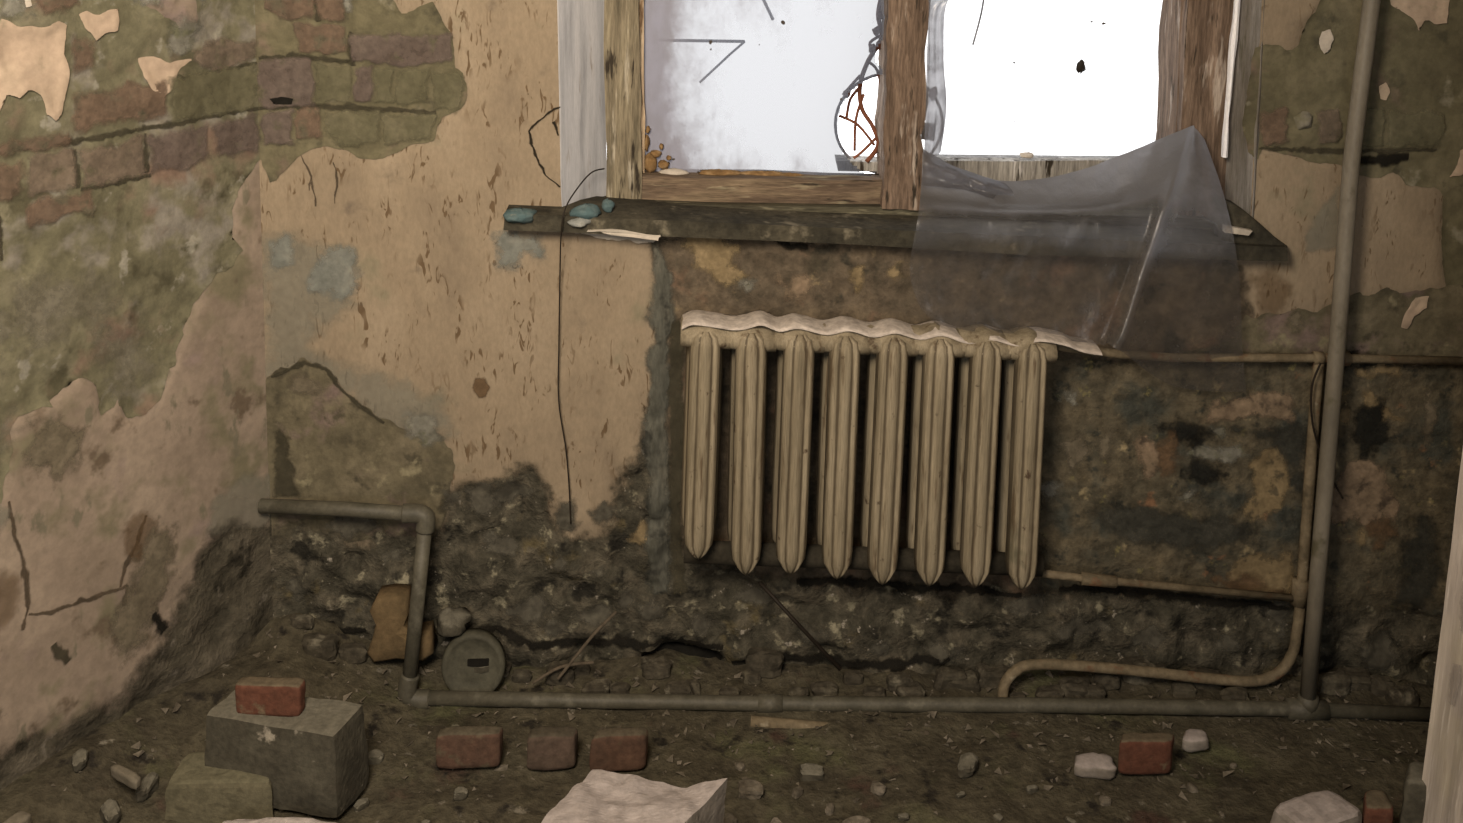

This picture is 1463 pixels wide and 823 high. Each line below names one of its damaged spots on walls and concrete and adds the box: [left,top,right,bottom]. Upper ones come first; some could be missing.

peeling [0,0,467,504]
spalling [1181,0,1463,366]
crack [8,501,147,630]
peeling [266,357,455,542]
spalling [641,643,723,661]
leakage [0,231,1463,791]